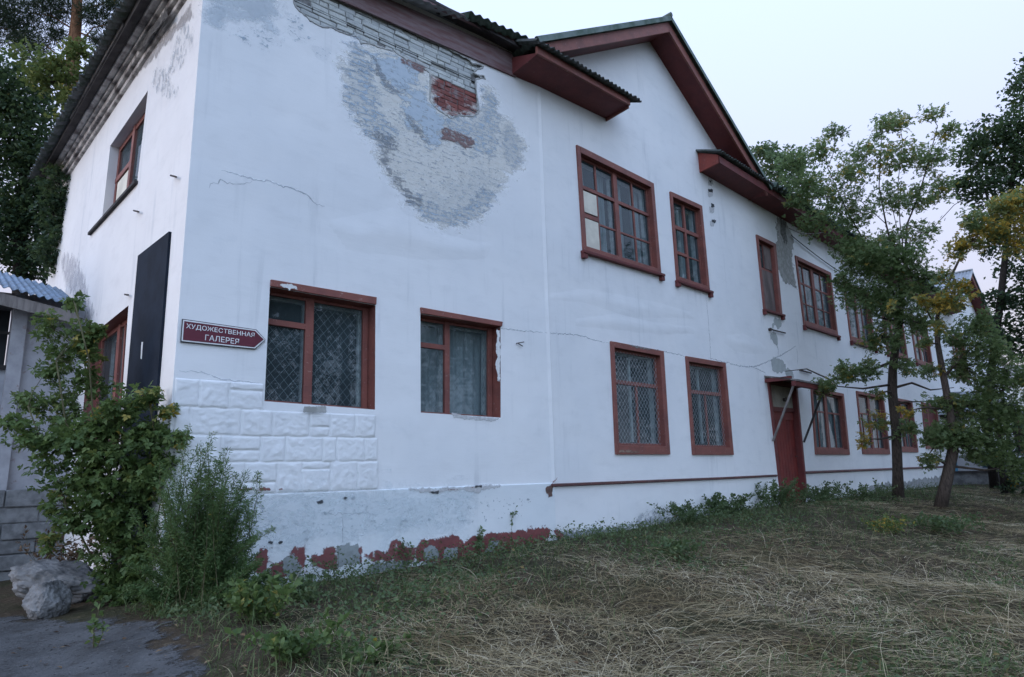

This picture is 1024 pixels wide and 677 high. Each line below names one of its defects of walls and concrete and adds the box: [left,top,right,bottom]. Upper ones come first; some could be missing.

peeling [288,0,527,227]
flaking render [775,216,797,289]
peeling [250,496,623,577]